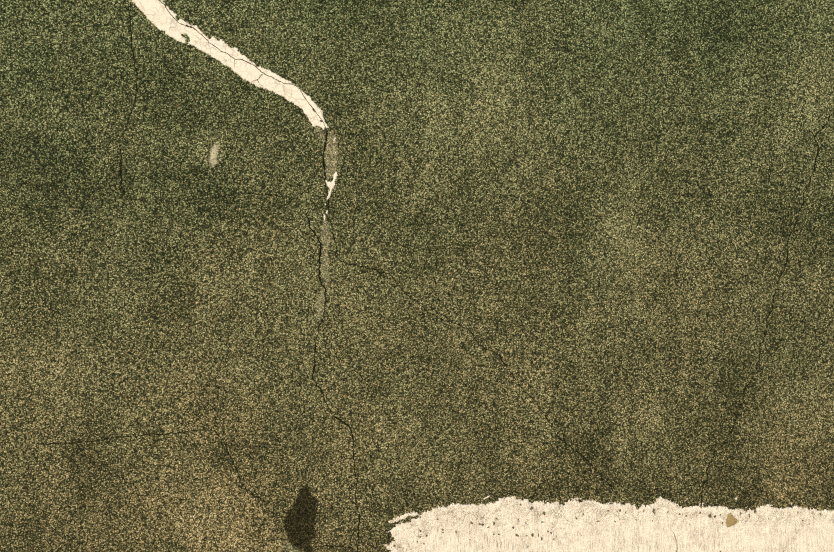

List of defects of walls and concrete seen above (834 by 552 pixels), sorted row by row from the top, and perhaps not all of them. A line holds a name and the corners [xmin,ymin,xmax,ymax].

crack [103,0,620,552]
crack [701,113,834,504]
water stain [287,488,316,552]
peeling [388,511,420,523]
flaking render [699,503,756,527]